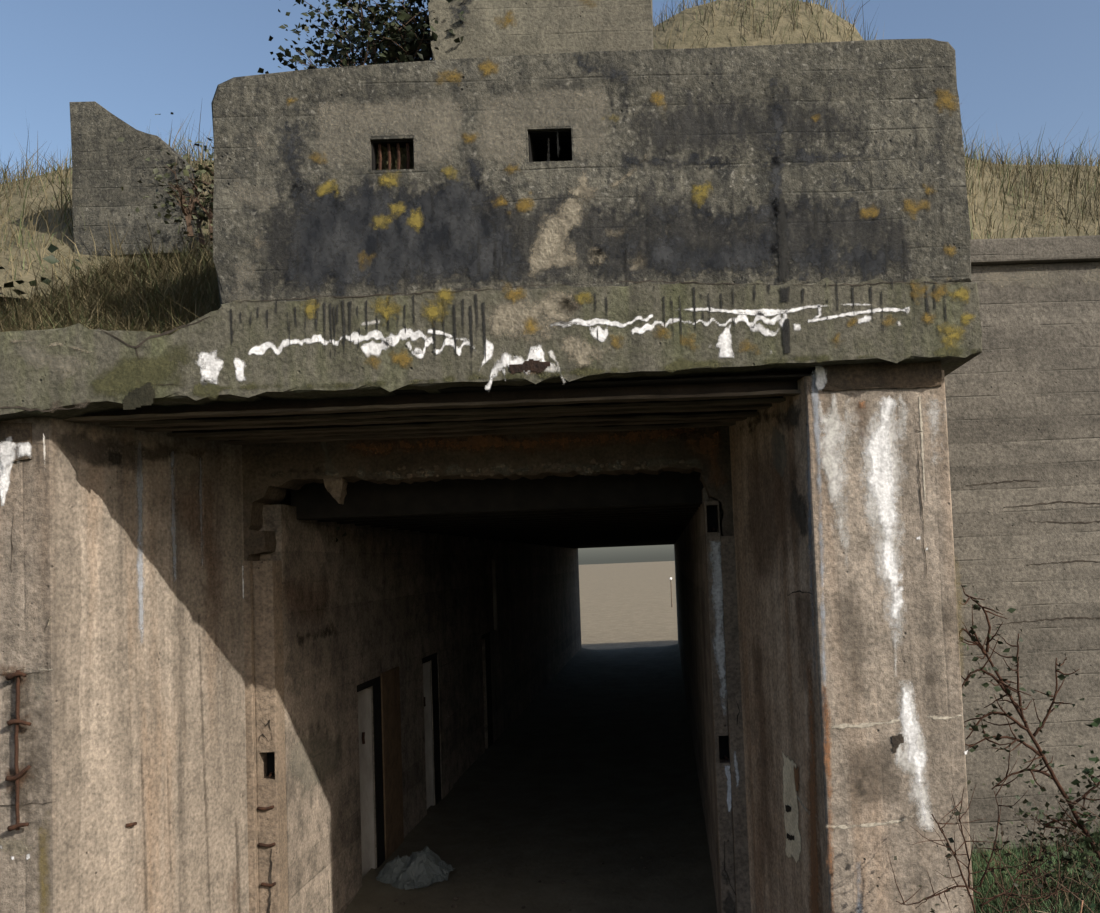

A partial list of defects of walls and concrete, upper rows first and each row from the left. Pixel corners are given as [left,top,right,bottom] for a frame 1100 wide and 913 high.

damp [197,78,947,385]
damp [0,434,45,505]
damp [58,431,177,629]
damp [748,371,825,627]
damp [864,397,903,670]
rust [5,670,32,831]
damp [892,684,934,829]